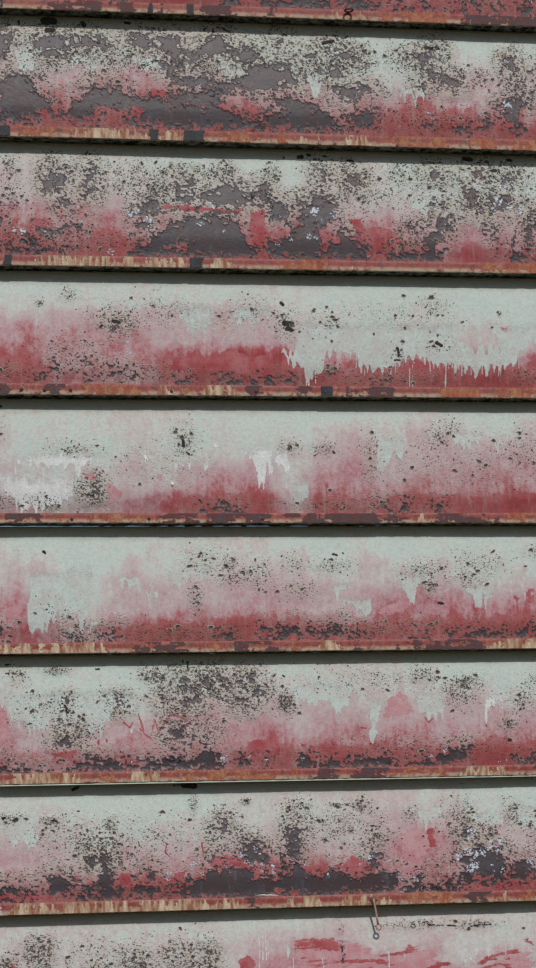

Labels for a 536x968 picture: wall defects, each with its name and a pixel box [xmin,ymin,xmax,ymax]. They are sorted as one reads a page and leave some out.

peeling [0,0,536,138]
corrosion [69,127,182,140]
peeling [0,156,105,255]
peeling [122,154,536,263]
corrosion [35,255,184,267]
corrosion [439,387,535,398]
corrosion [0,643,110,654]
peeling [208,615,375,651]
corrosion [492,638,536,648]
peeling [0,798,536,908]
corrosion [7,898,243,915]
peeling [291,937,462,968]